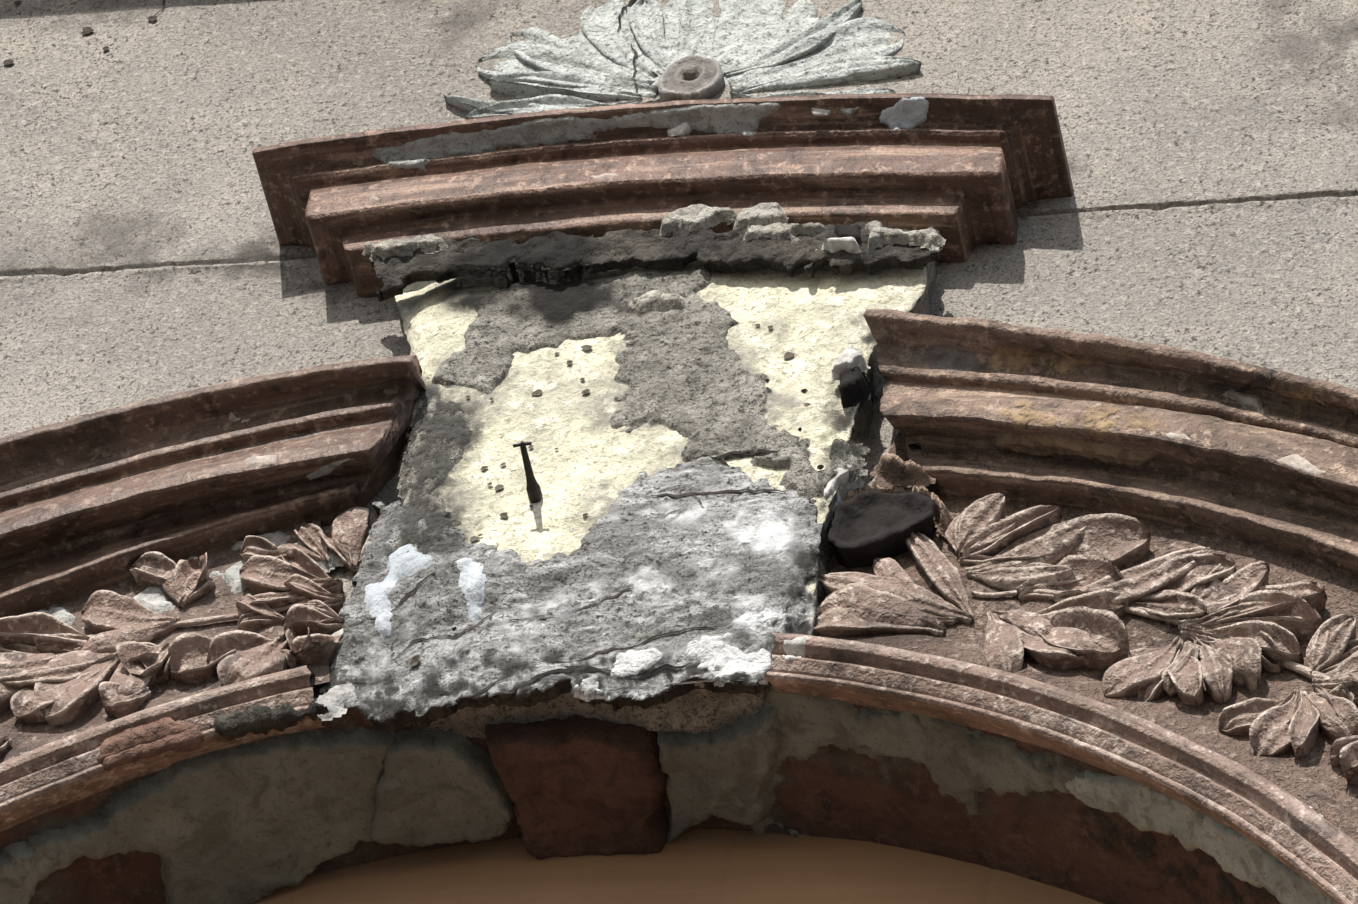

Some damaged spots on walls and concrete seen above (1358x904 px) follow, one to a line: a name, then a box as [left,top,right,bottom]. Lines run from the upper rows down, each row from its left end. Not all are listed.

crack [617,0,638,93]
peeling [371,102,781,172]
spalling [362,202,946,302]
damp [820,392,863,509]
peeling [36,607,87,629]
peeling [133,586,176,614]
peeling [188,531,344,594]
peeling [364,544,433,638]
peeling [455,558,487,622]
damp [789,547,818,601]
damp [322,616,811,719]
peeling [0,628,1337,904]